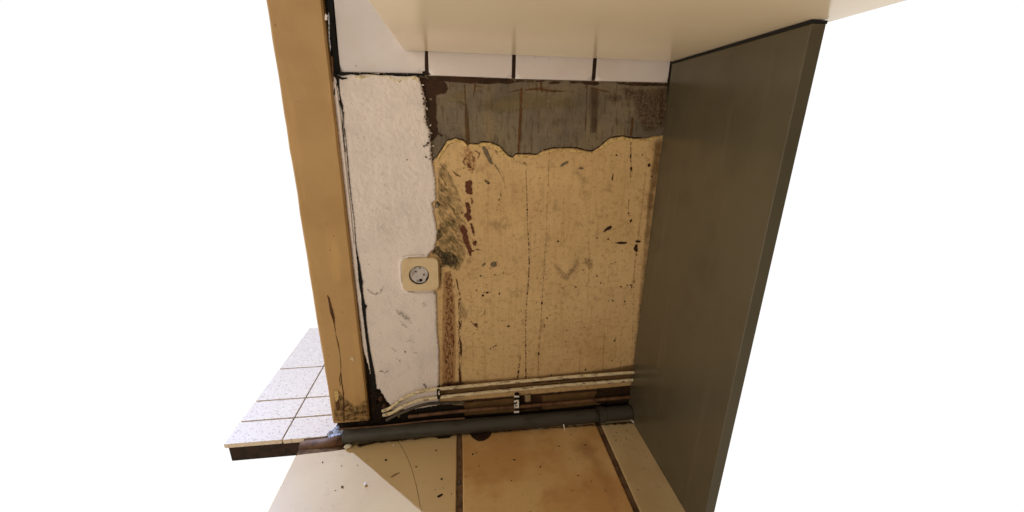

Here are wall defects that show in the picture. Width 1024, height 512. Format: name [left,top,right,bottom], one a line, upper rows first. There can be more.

mould [432,230,458,278]
peeling [419,75,668,269]